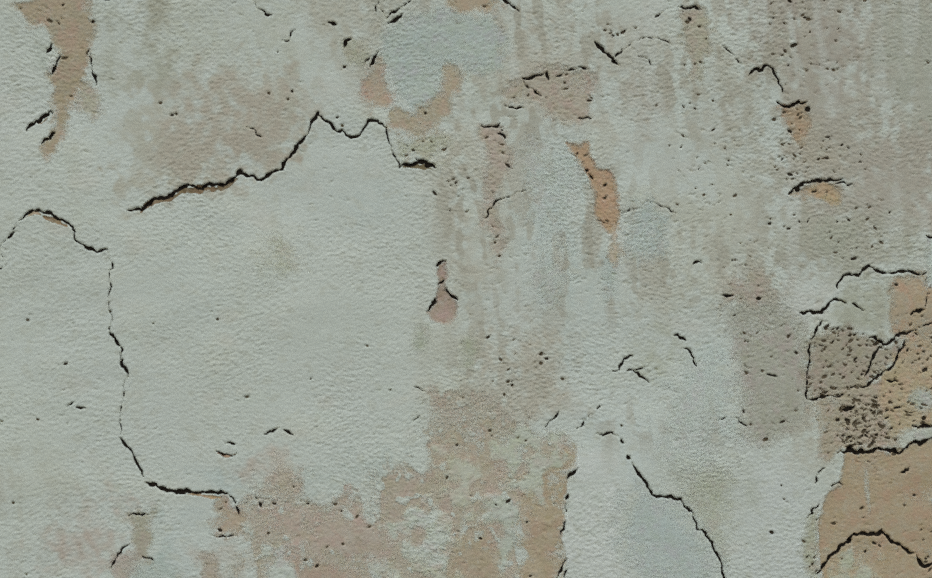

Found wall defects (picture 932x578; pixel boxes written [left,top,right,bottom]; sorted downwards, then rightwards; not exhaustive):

peeling [9,0,98,164]
peeling [444,0,505,18]
crack [127,112,435,213]
crack [3,209,262,514]
peeling [195,380,578,578]
peeling [426,261,458,325]
crack [560,469,577,534]
crack [577,406,725,578]
peeling [796,269,932,578]
crack [800,265,932,412]
crack [816,529,932,574]
crack [841,406,932,473]